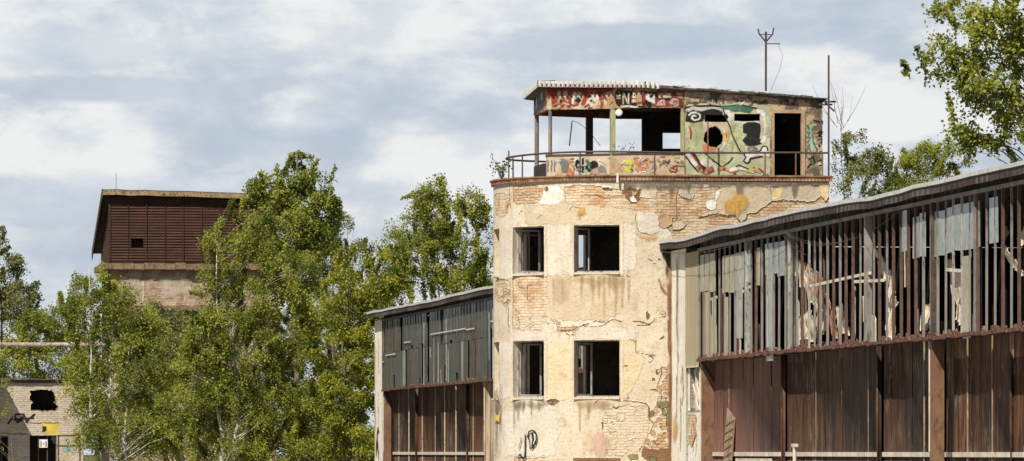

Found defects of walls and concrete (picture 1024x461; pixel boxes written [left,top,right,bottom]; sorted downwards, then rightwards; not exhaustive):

spalling [495,184,549,217]
spalling [564,181,829,239]
spalling [496,275,579,332]
crack [561,281,695,451]
rust [698,321,1024,359]
spalling [573,364,670,461]